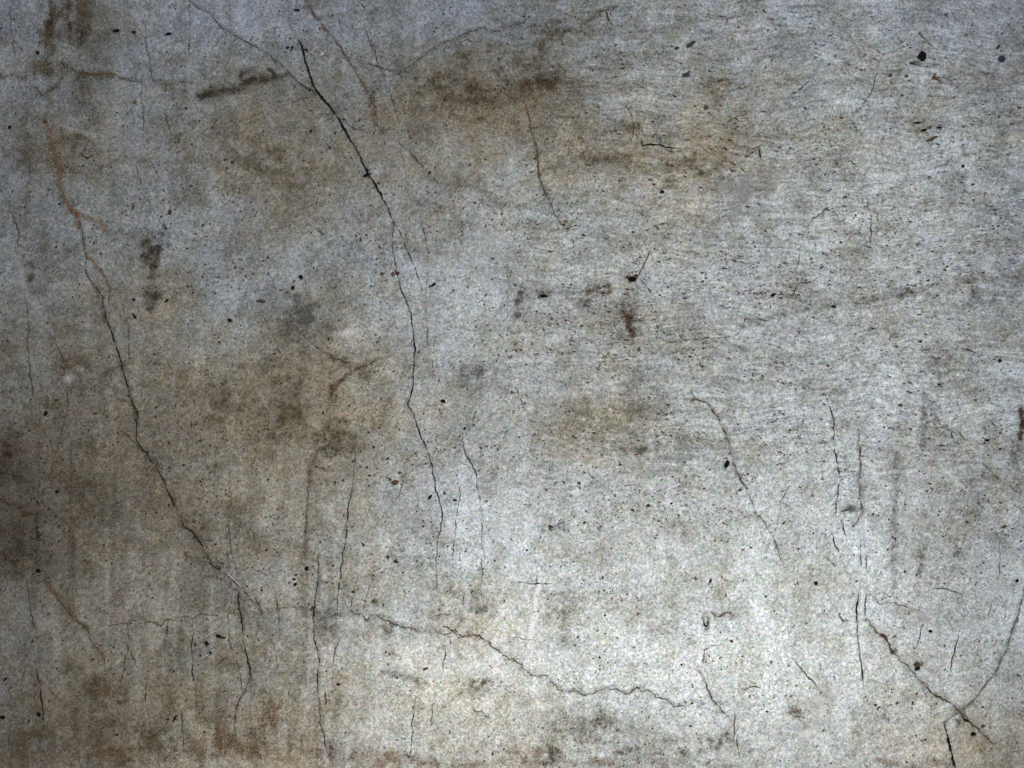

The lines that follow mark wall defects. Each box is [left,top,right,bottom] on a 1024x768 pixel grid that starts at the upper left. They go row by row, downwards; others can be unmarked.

damp [416,52,535,111]
crack [27,2,740,758]
crack [856,594,1024,768]